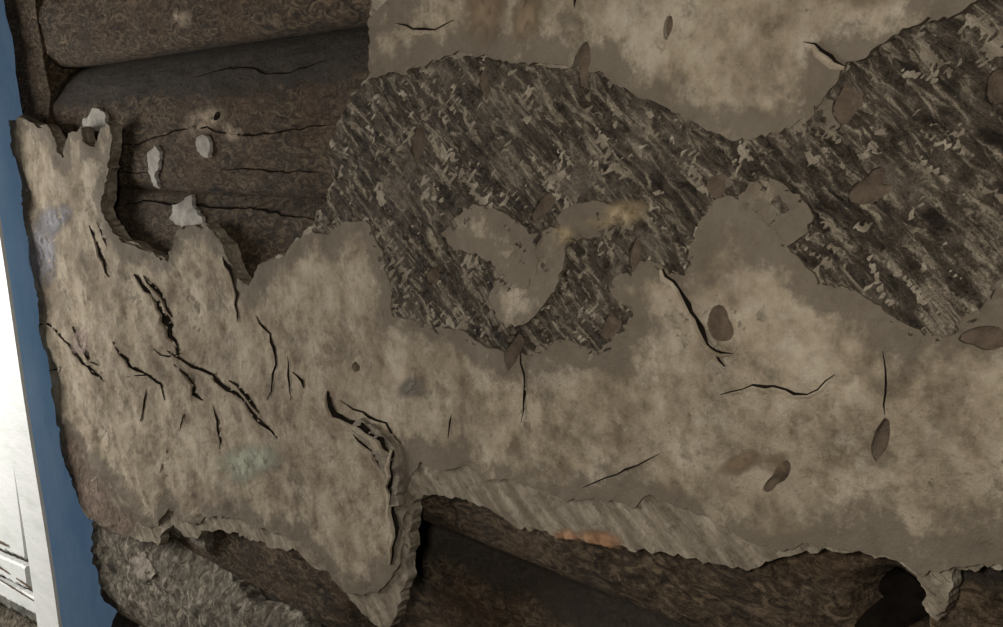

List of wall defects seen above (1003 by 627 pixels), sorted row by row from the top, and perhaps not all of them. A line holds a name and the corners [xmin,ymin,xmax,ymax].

crack [395,20,454,35]
crack [803,41,847,70]
spalling [196,134,213,158]
crack [122,124,332,146]
spalling [147,145,163,189]
crack [224,167,317,175]
spalling [312,0,1003,369]
crack [115,200,315,221]
crack [88,223,109,277]
crack [38,256,399,565]
spalling [874,419,890,459]
peeling [129,551,158,585]